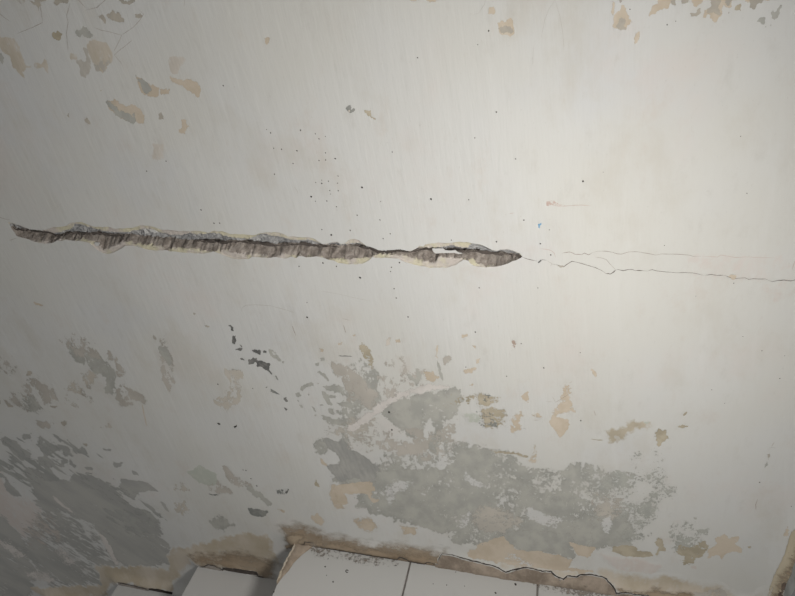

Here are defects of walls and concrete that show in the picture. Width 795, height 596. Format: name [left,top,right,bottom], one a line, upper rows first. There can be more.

peeling [0,0,144,78]
peeling [611,0,631,30]
peeling [649,0,769,22]
peeling [136,56,201,98]
peeling [106,99,145,124]
crack [523,249,795,282]
peeling [213,325,284,409]
peeling [0,333,190,596]
peeling [266,334,751,574]
peeling [187,465,285,517]
crack [304,542,649,596]
damp [496,562,773,596]